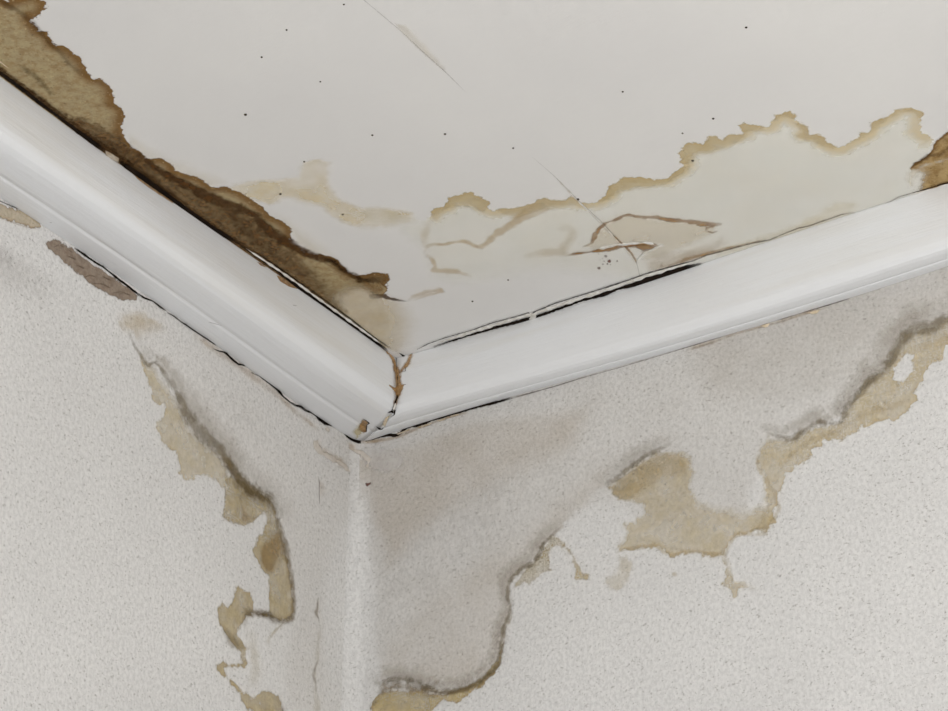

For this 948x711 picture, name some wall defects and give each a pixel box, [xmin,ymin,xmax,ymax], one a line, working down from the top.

damp [432,108,913,219]
peeling [0,201,41,228]
peeling [46,239,139,301]
crack [0,72,844,443]
peeling [355,419,370,435]
damp [371,649,502,711]